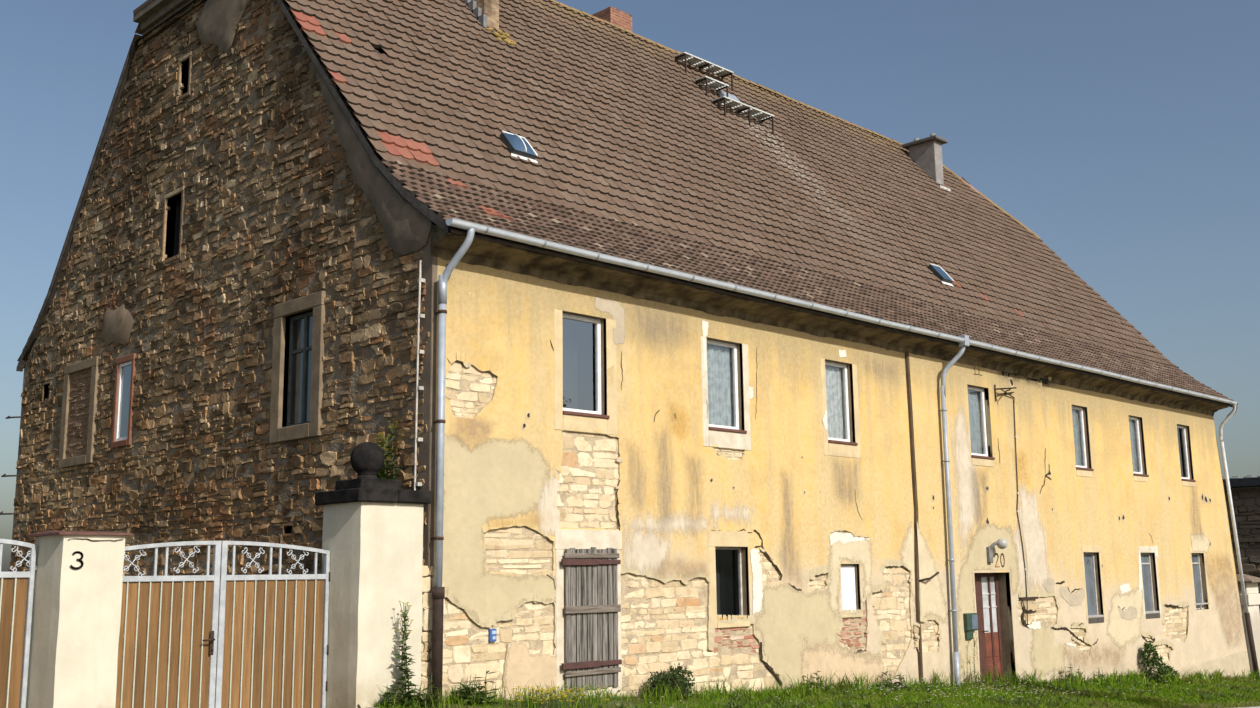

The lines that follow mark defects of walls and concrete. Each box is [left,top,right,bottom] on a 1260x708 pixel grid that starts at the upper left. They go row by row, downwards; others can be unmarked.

spalling [445,351,500,418]
spalling [421,591,557,701]
spalling [482,428,788,697]
peeling [829,532,870,546]
spalling [836,558,943,678]
peeling [1013,486,1092,655]
crack [1022,600,1098,645]
spalling [1118,546,1188,663]